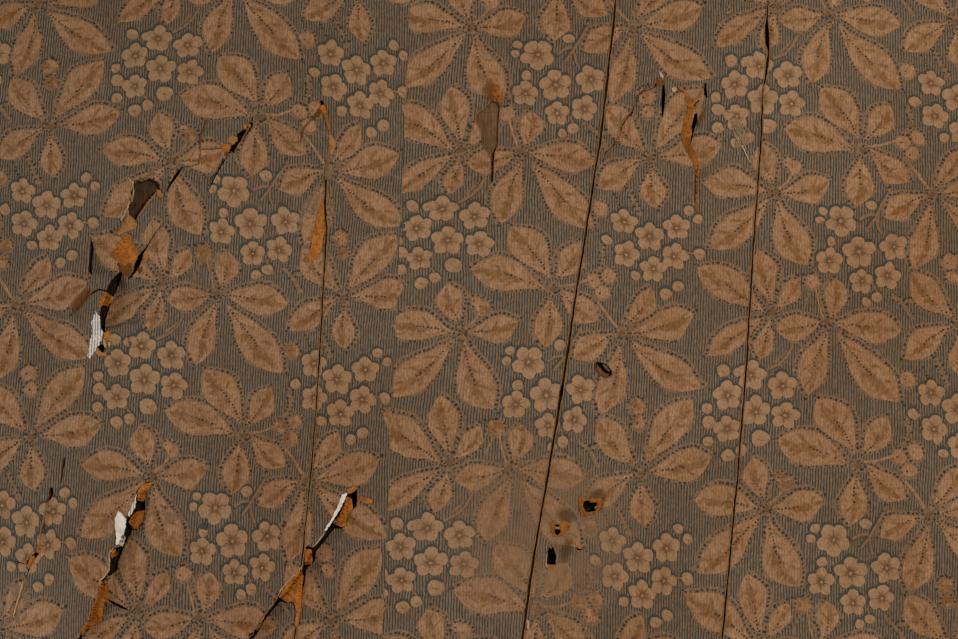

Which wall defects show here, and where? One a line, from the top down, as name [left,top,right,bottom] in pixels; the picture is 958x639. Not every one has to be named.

spalling [208,116,253,191]
spalling [476,101,500,183]
spalling [603,77,666,163]
spalling [691,83,708,142]
spalling [128,167,183,220]
spalling [88,221,165,332]
crack [58,457,66,483]
spalling [101,480,154,585]
spalling [301,490,357,604]
spalling [545,521,570,571]
spalling [579,495,606,516]
spalling [248,588,286,639]